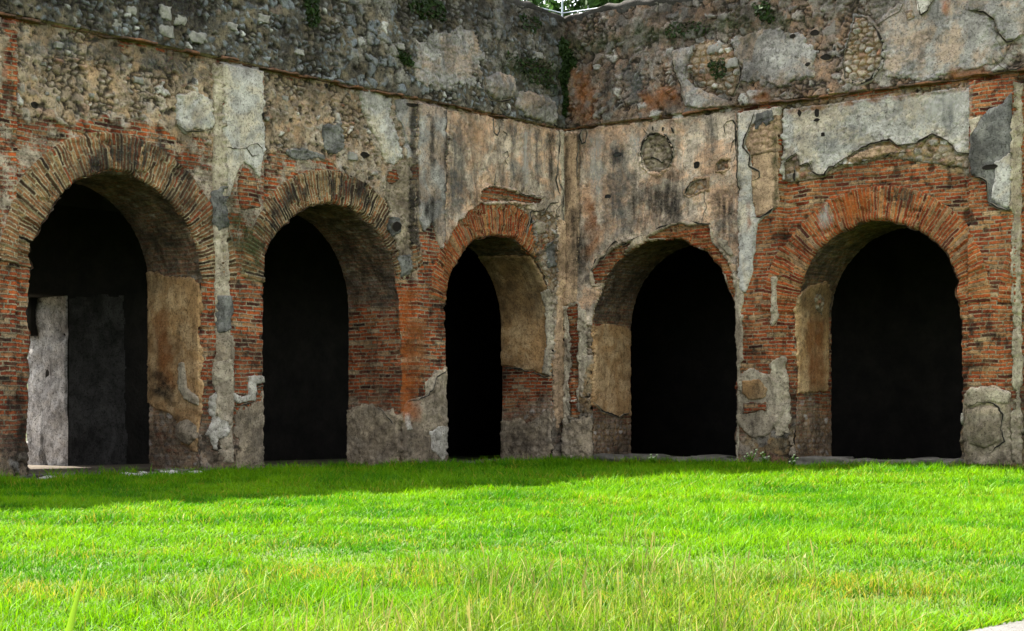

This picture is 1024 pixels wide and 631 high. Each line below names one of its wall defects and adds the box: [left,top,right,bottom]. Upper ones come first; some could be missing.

peeling [174,63,265,470]
water stain [410,107,418,153]
water stain [409,167,435,242]
water stain [430,116,463,205]
peeling [479,173,588,459]
water stain [511,128,683,272]
peeling [589,155,792,460]
peeling [742,81,1024,466]
peeling [399,367,449,464]